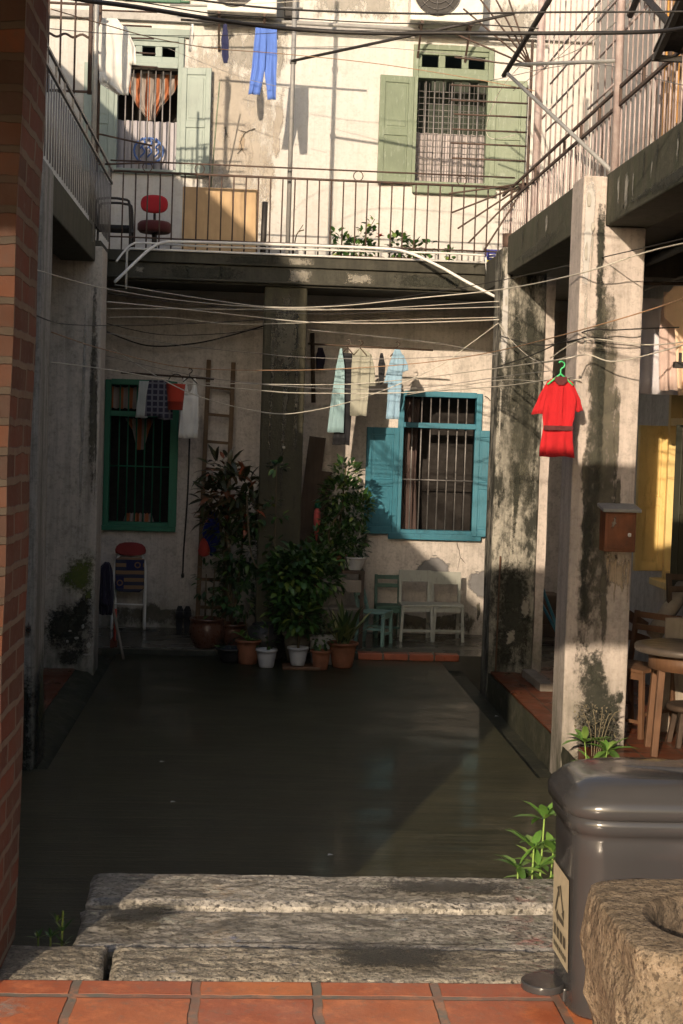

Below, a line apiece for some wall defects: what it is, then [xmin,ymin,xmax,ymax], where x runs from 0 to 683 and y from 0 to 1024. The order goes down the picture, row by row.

damp [617,146,683,207]
damp [508,301,539,538]
damp [574,204,623,760]
mould [45,597,93,664]
damp [370,603,480,632]
flaking render [416,555,450,572]
flaking render [468,571,484,598]
damp [492,551,532,672]